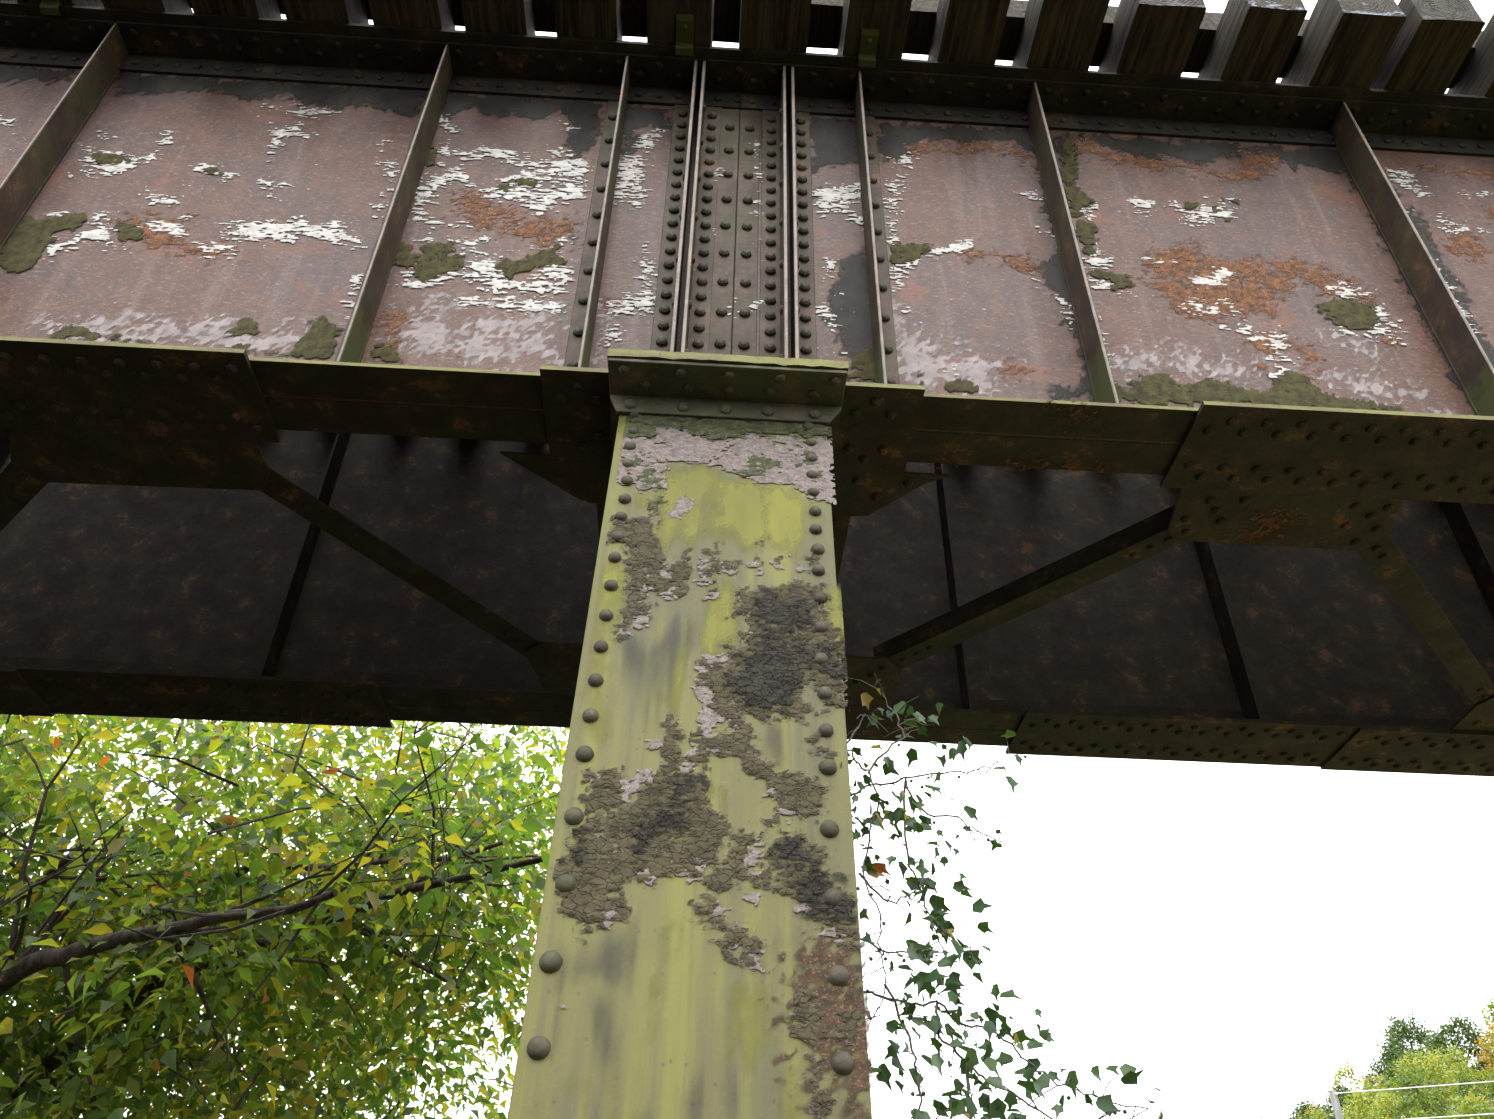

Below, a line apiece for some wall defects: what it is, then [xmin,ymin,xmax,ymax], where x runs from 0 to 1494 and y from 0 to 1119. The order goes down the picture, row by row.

peeling [47,211,126,262]
peeling [67,130,180,178]
peeling [137,101,400,268]
peeling [395,114,594,318]
peeling [812,182,864,230]
peeling [889,236,974,323]
rust [957,241,1044,275]
peeling [1118,190,1241,227]
peeling [1178,266,1300,378]
rust [1134,238,1378,383]
peeling [1325,281,1422,348]
peeling [553,426,865,973]